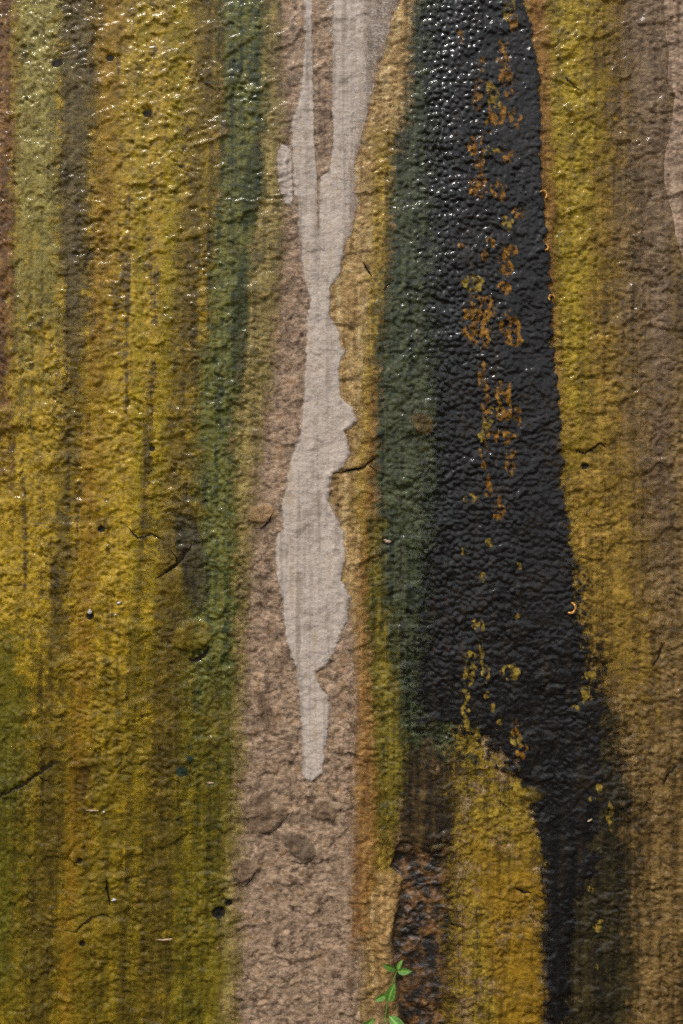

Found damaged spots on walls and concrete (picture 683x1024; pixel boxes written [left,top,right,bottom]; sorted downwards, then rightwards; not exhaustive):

crack [0,760,60,796]
damp [24,0,96,1024]
crack [127,526,192,579]
damp [140,0,220,1024]
damp [231,0,399,1024]
crack [335,457,378,473]
damp [400,0,683,1024]